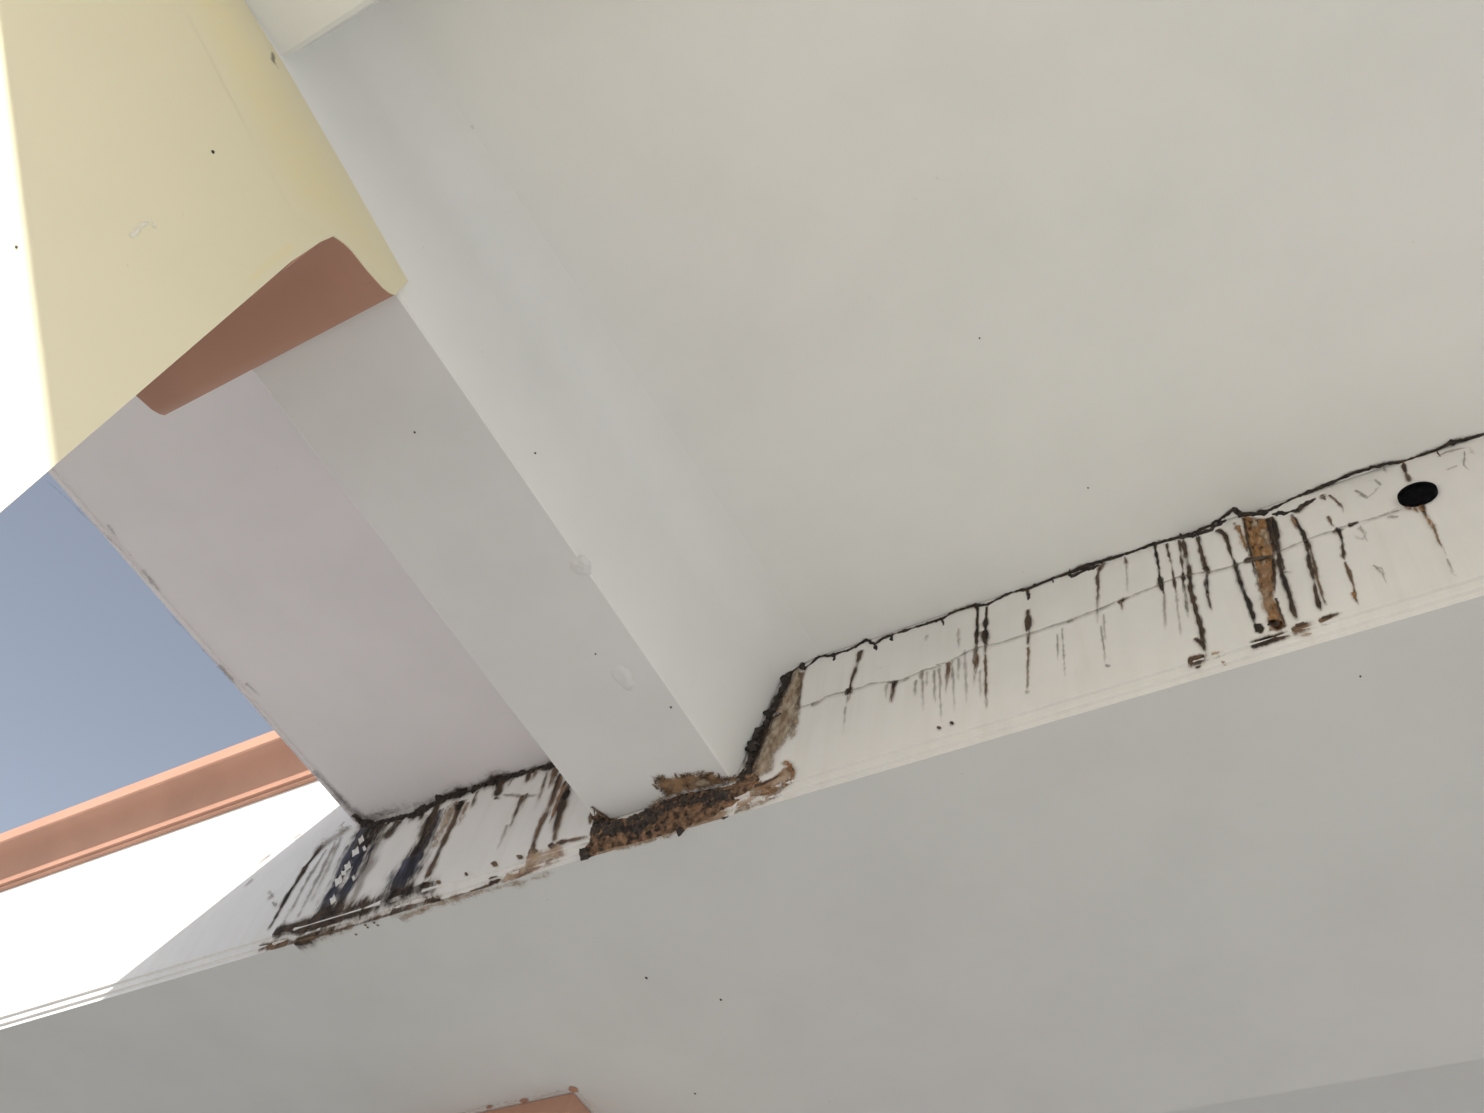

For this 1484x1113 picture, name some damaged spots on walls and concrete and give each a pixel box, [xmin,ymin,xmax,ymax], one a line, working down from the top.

crack [734,433,1484,781]
crack [351,761,556,829]
spalling [579,770,784,861]